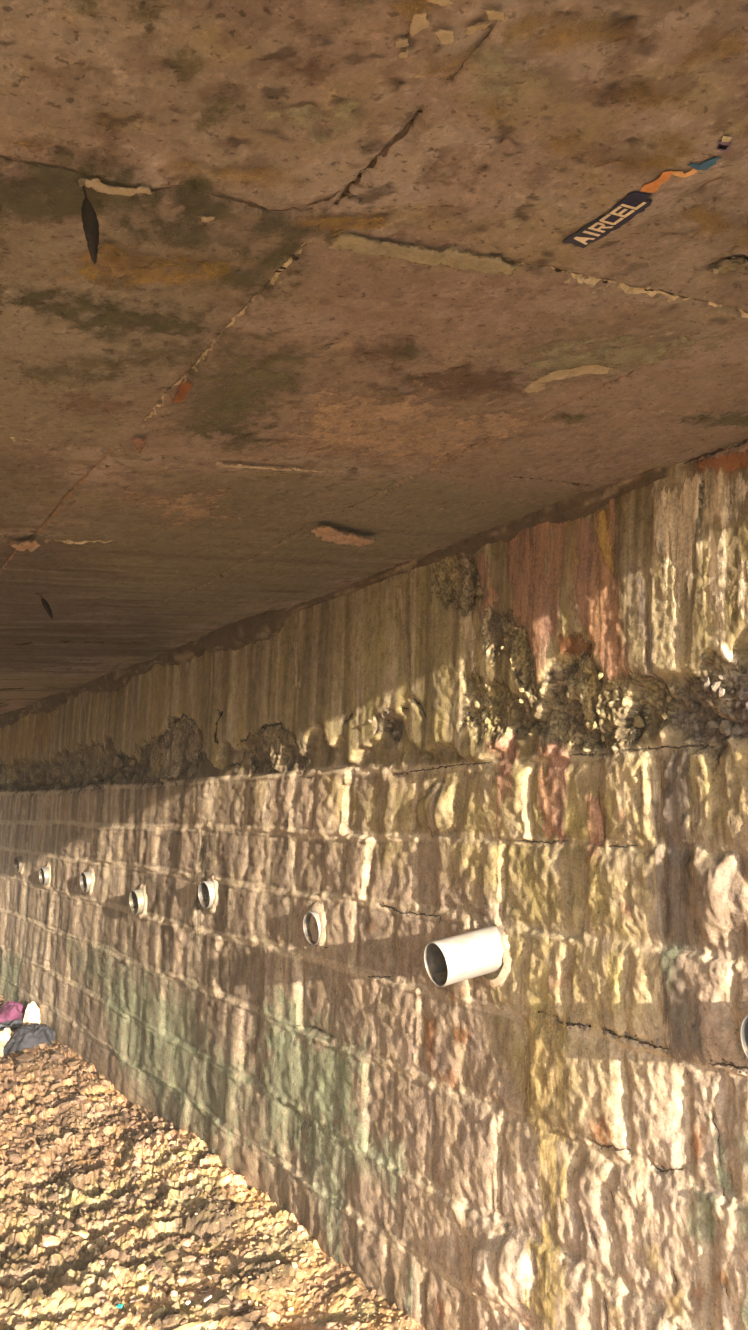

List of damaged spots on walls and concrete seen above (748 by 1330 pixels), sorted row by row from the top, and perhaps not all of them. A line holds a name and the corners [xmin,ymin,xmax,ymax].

flaking render [394,0,505,58]
crack [447,21,497,80]
crack [0,110,422,574]
spalling [311,526,375,546]
corrosion [469,498,632,682]
water stain [652,468,748,664]
water stain [459,609,477,675]
water stain [638,576,664,684]
crack [537,1010,668,1050]